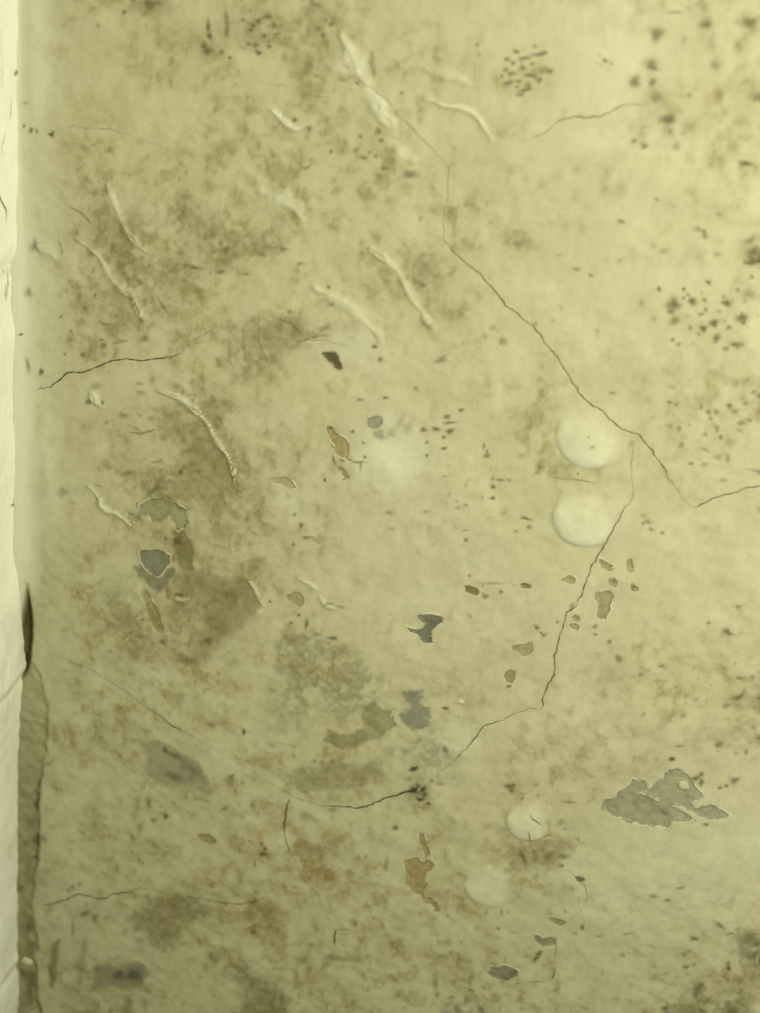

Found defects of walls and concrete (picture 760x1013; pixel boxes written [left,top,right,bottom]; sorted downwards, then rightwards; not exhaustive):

crack [51,353,181,387]
crack [450,247,671,481]
peeling [327,426,353,480]
crack [694,486,759,508]
peeling [85,481,193,633]
peeling [404,612,443,643]
crack [533,509,624,709]
peeling [325,682,471,747]
crack [338,788,418,809]
peeling [602,758,732,830]
crack [46,892,126,905]
peeling [404,833,439,911]